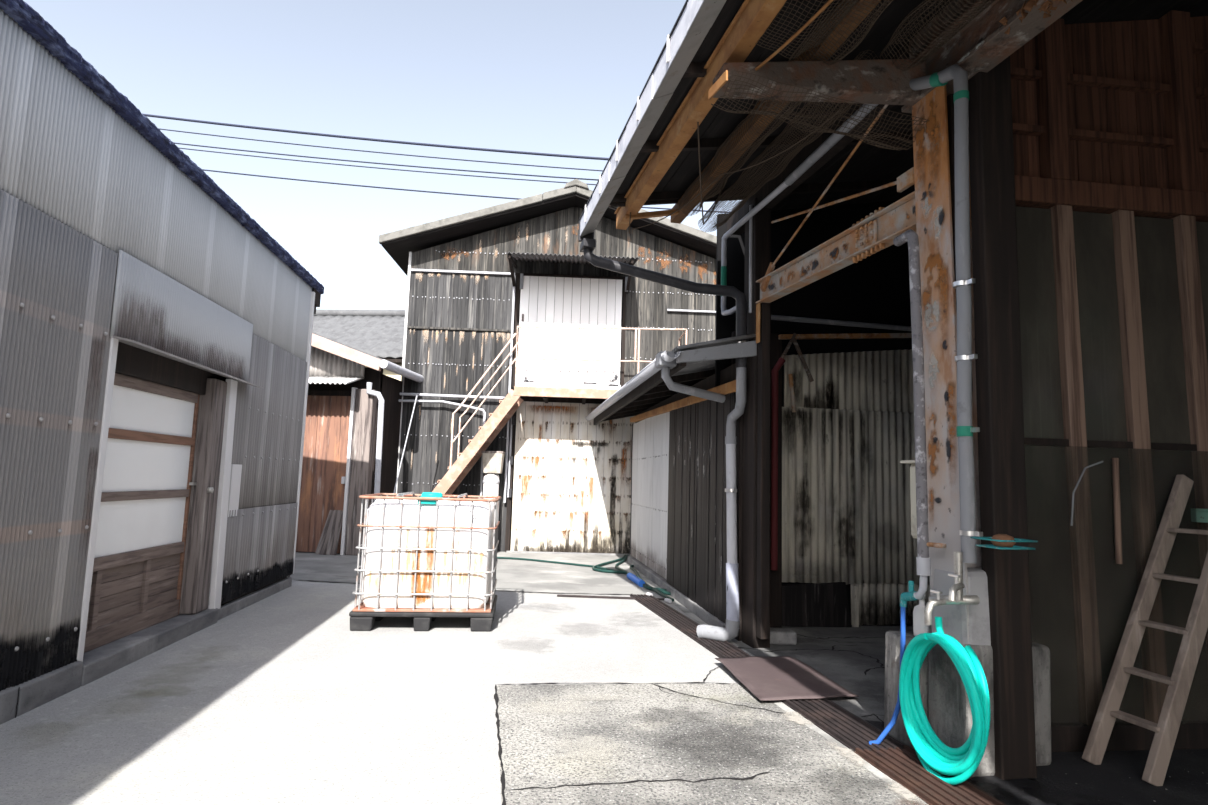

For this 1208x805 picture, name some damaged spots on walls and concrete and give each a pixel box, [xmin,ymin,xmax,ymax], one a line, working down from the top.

rust [915,102,939,179]
rust [922,253,948,319]
water stain [783,372,865,482]
rust [928,383,956,475]
rust [516,405,633,536]
water stain [795,482,811,555]
water stain [838,505,855,557]
water stain [0,624,80,691]
crack [624,645,885,713]
crack [494,683,768,805]